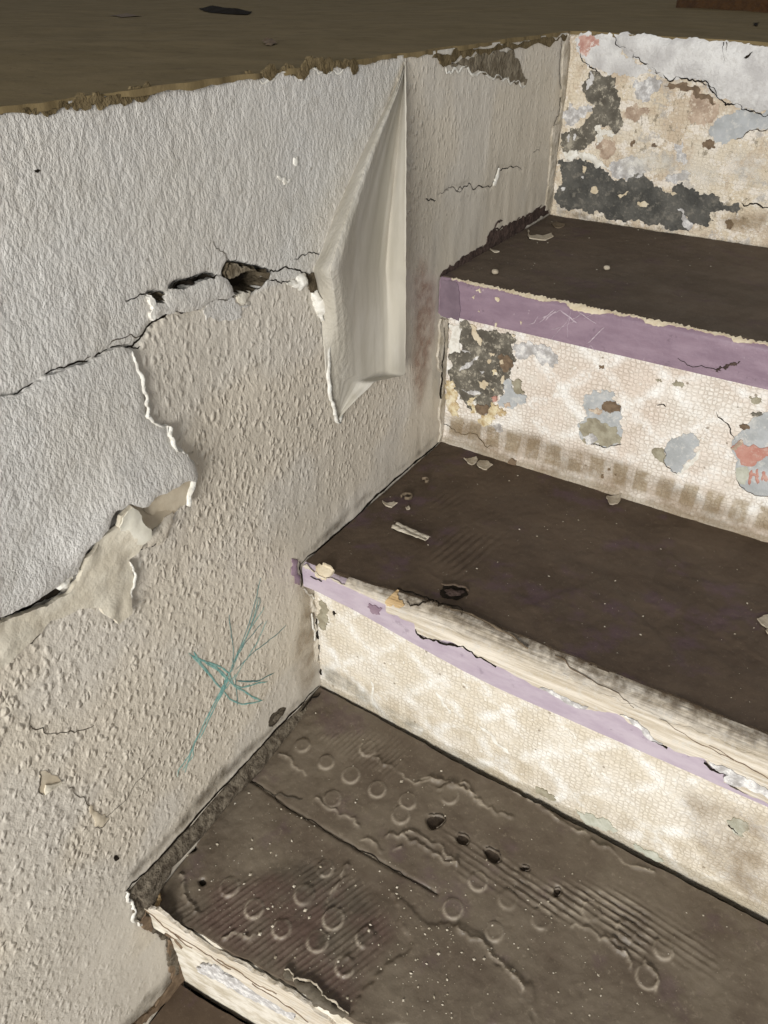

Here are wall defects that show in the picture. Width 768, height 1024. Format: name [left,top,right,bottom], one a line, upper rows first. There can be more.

flaking render [18,81,155,117]
flaking render [245,56,359,84]
peeling [432,31,768,117]
crack [426,152,534,202]
peeling [562,125,616,194]
crack [13,309,199,395]
peeling [436,318,511,442]
peeling [464,456,493,470]
peeling [0,346,198,669]
crack [397,587,496,668]
crack [555,655,634,708]
crack [651,719,768,795]